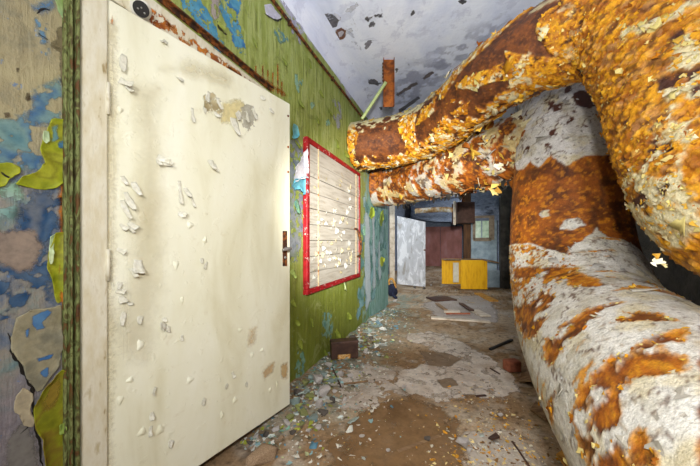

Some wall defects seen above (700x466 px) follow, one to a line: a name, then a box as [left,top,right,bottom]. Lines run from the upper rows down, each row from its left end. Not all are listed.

spalling [51,27,62,83]
rust [149,4,251,82]
peeling [181,0,258,55]
peeling [264,4,283,22]
spalling [325,4,358,28]
peeling [0,118,63,190]
peeling [203,91,223,118]
peeling [230,105,258,135]
peeling [336,0,700,256]
spalling [6,231,67,466]
crack [7,333,43,466]
peeling [644,440,664,465]